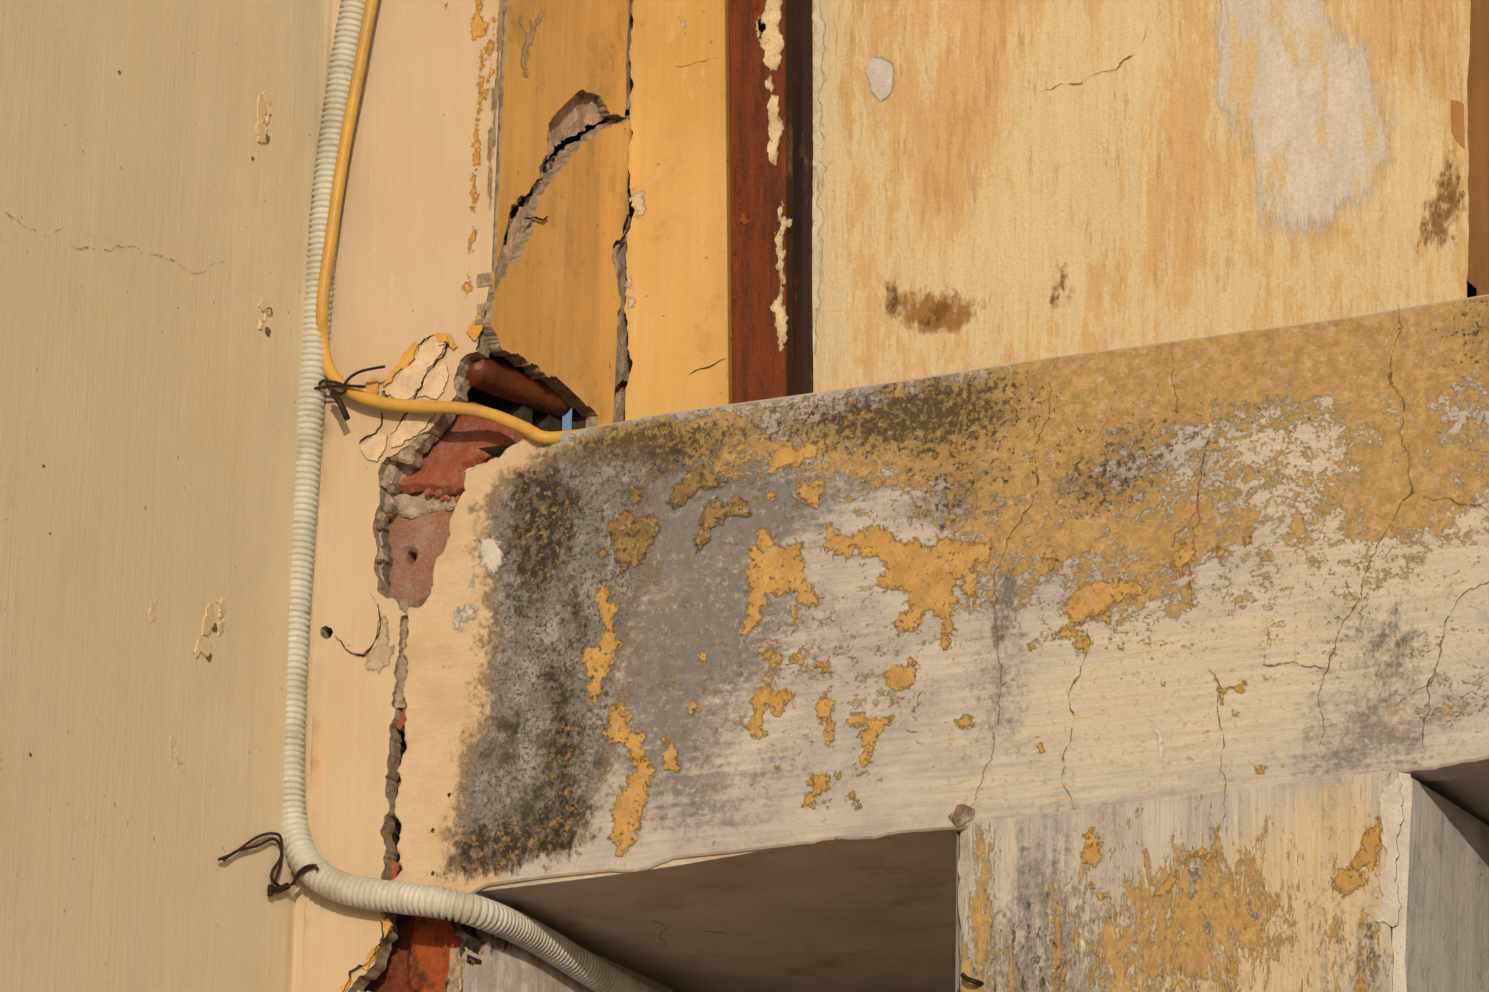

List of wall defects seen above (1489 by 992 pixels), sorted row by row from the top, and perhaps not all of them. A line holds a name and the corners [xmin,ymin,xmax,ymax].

crack [523,150,568,221]
crack [612,170,635,388]
peeling [756,0,784,166]
peeling [812,0,828,354]
peeling [1215,0,1395,241]
leakage [1417,163,1464,247]
crack [390,598,419,880]
leakage [443,441,664,881]
peeling [579,442,994,857]
crack [971,364,1055,806]
crack [1208,305,1489,820]
flaking render [340,911,484,992]